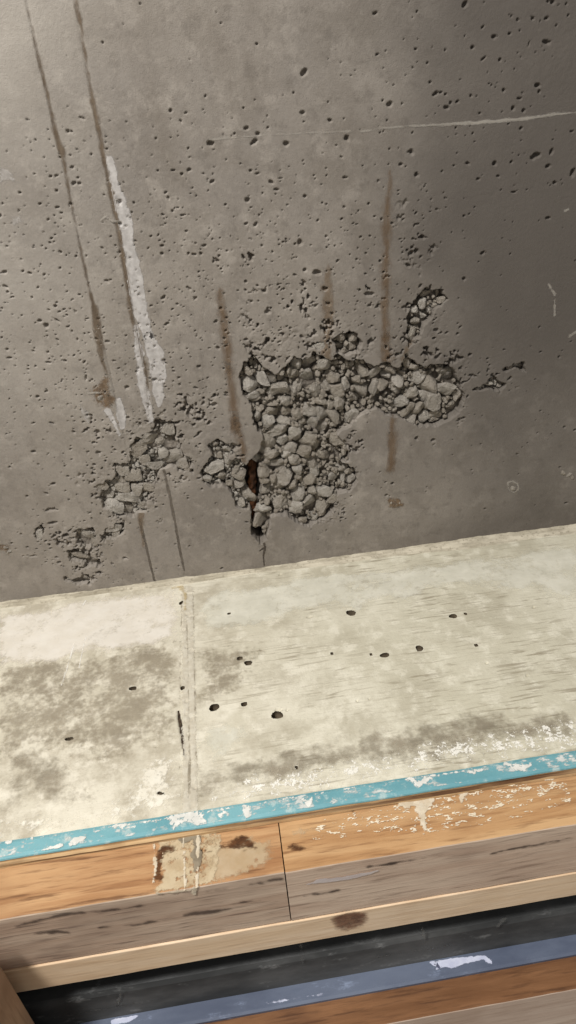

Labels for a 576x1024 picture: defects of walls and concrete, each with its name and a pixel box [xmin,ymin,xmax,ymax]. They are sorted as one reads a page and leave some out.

efflorescence [106,156,167,423]
efflorescence [104,397,126,436]
rust [220,307,244,458]
spalling [247,459,257,524]
efflorescence [106,758,180,818]
damp [210,720,576,801]